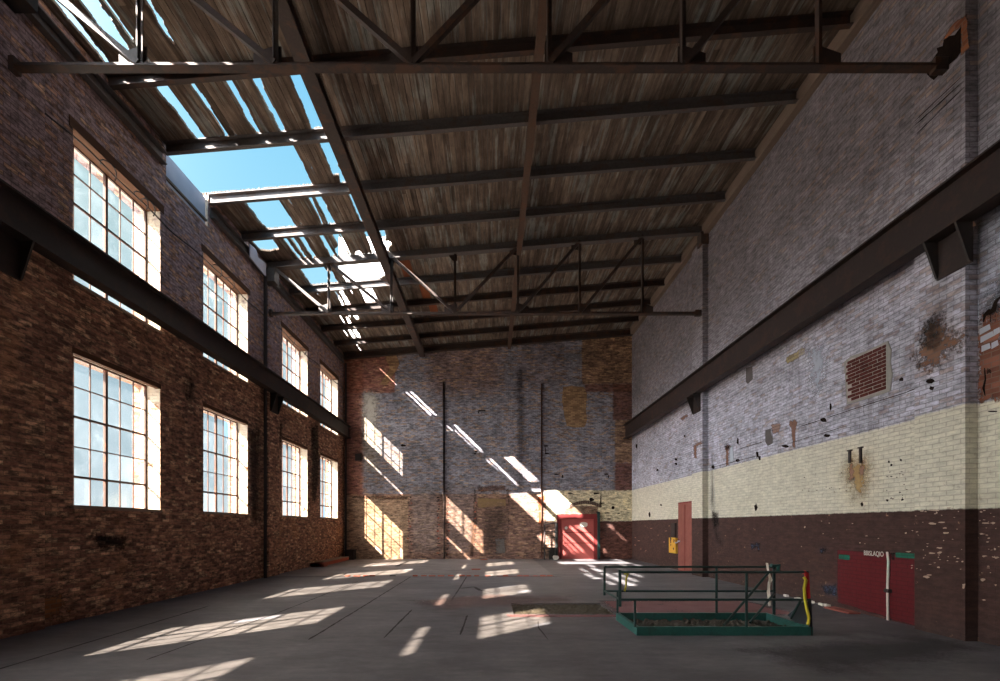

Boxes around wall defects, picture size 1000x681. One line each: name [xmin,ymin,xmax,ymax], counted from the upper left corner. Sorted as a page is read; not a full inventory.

spalling [933,15,970,64]
peeling [910,308,1000,412]
corrosion [789,420,797,448]
corrosion [847,460,868,493]